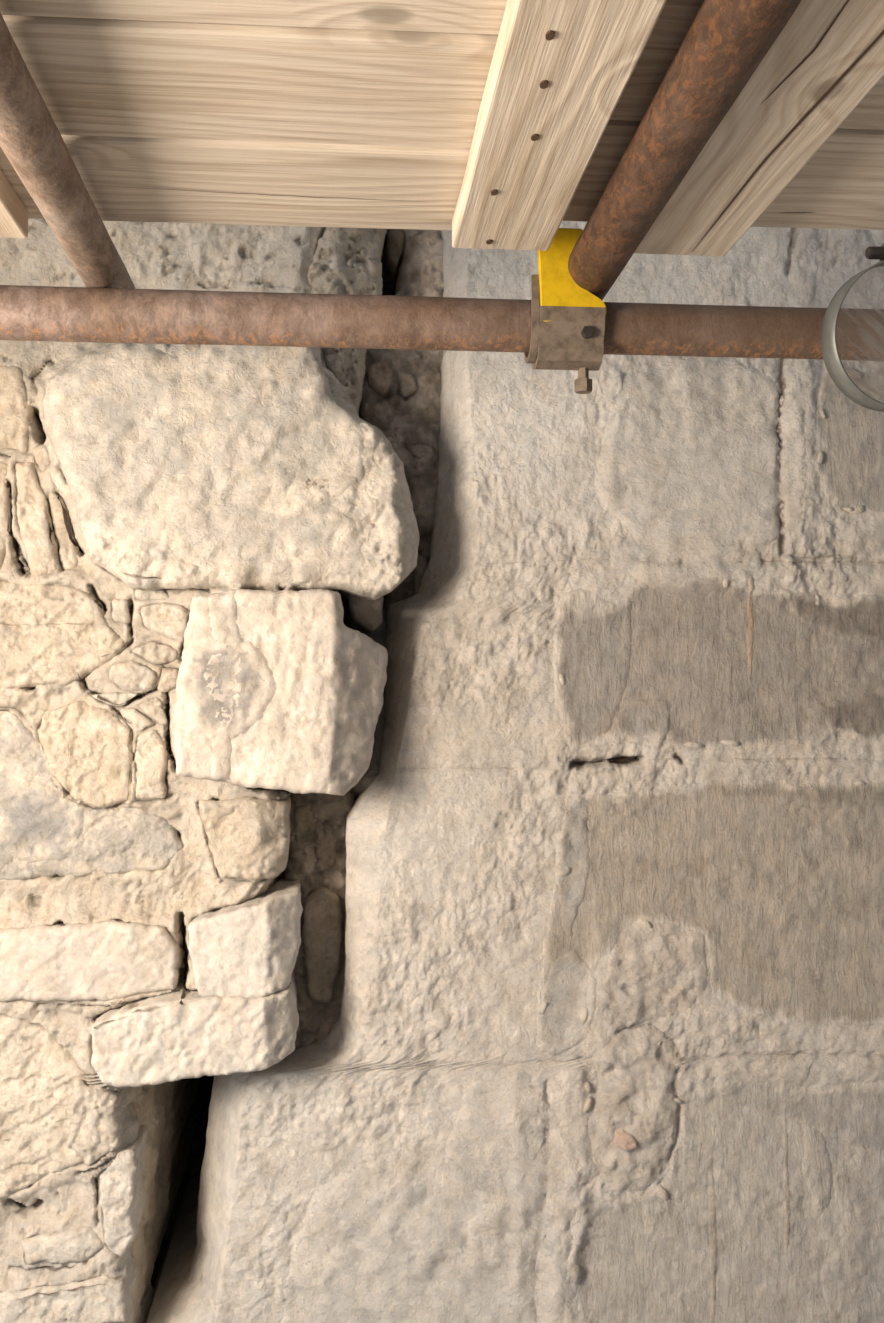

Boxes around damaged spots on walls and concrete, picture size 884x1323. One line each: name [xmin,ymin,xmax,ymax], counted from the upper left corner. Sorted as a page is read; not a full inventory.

crack [100,185,444,297]
crack [2,454,84,575]
crack [344,349,444,648]
crack [69,573,175,810]
crack [80,915,188,1029]
crack [258,690,385,1051]
leakage [536,796,597,1056]
leakage [552,588,670,746]
leakage [718,777,884,810]
leakage [780,589,884,640]
leakage [816,692,884,741]
crack [151,1075,214,1288]